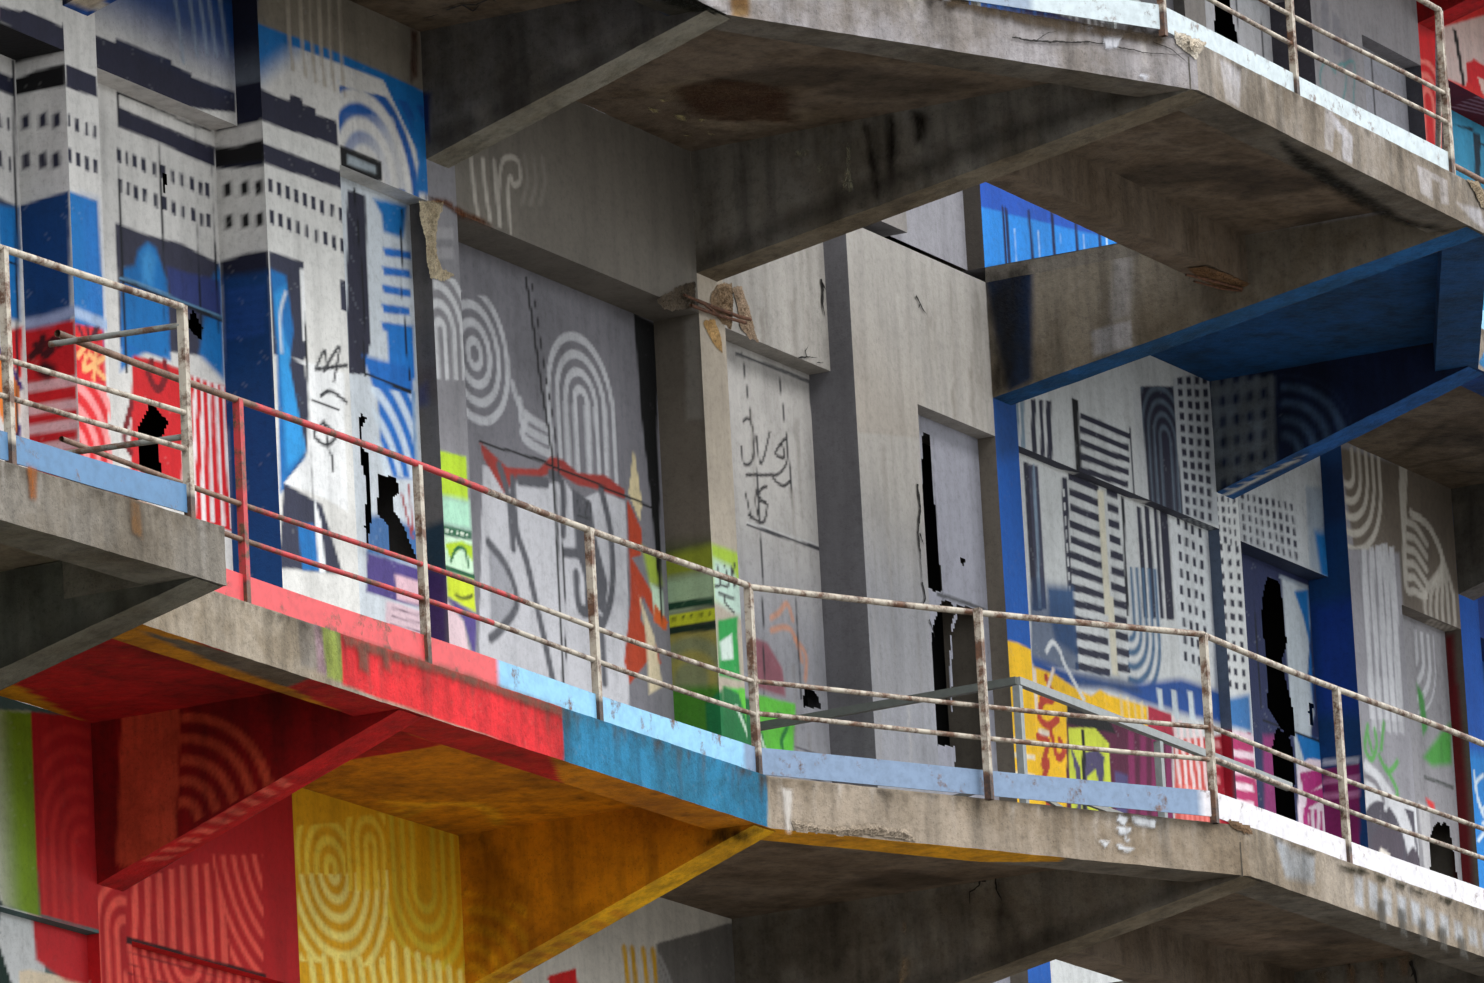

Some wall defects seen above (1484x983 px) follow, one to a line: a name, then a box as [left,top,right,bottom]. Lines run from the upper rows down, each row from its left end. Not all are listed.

spalling [419,200,454,281]
spalling [657,281,759,353]